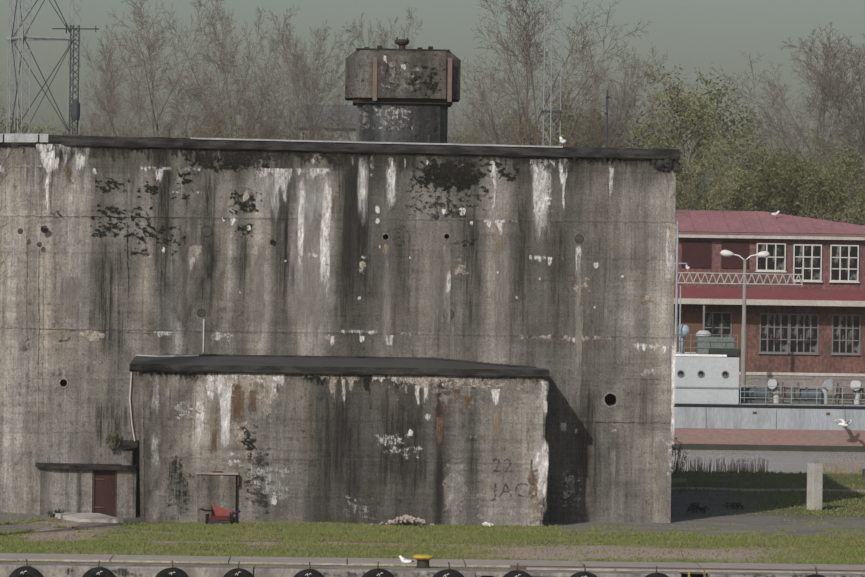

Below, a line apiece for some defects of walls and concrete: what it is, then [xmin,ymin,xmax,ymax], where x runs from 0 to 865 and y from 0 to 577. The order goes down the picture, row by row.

leakage [36,144,89,209]
leakage [141,167,178,242]
leakage [388,158,406,202]
leakage [525,158,567,236]
leakage [256,155,380,338]
leakage [343,244,394,345]
spalling [79,330,104,342]
rust [231,382,258,420]
leakage [373,375,547,439]
rust [528,469,539,499]
leakage [535,442,548,505]